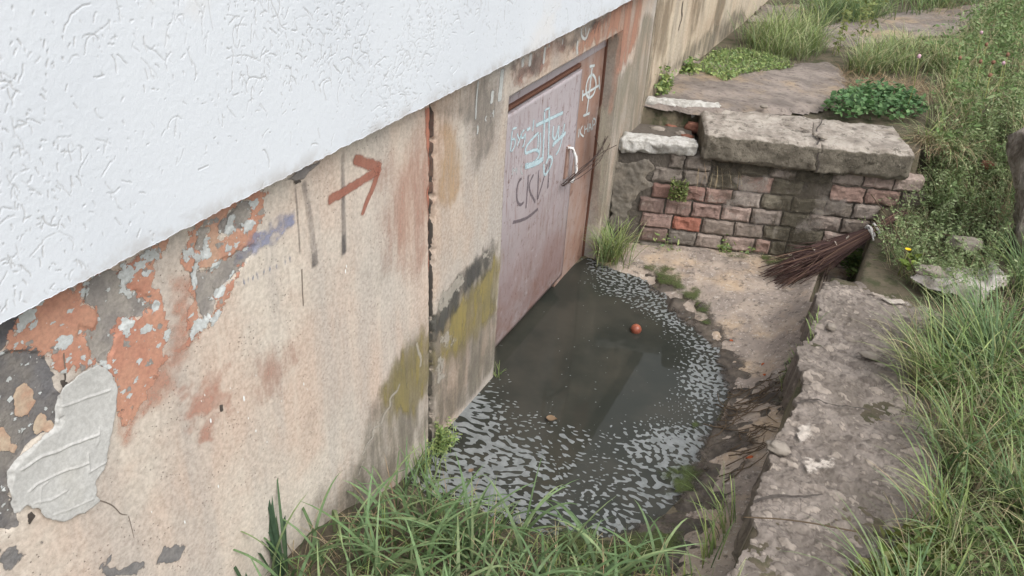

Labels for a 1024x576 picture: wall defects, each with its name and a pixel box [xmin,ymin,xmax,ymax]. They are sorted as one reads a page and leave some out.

peeling [0,238,171,529]
peeling [180,190,269,347]
water stain [350,251,500,505]
crack [815,117,823,172]